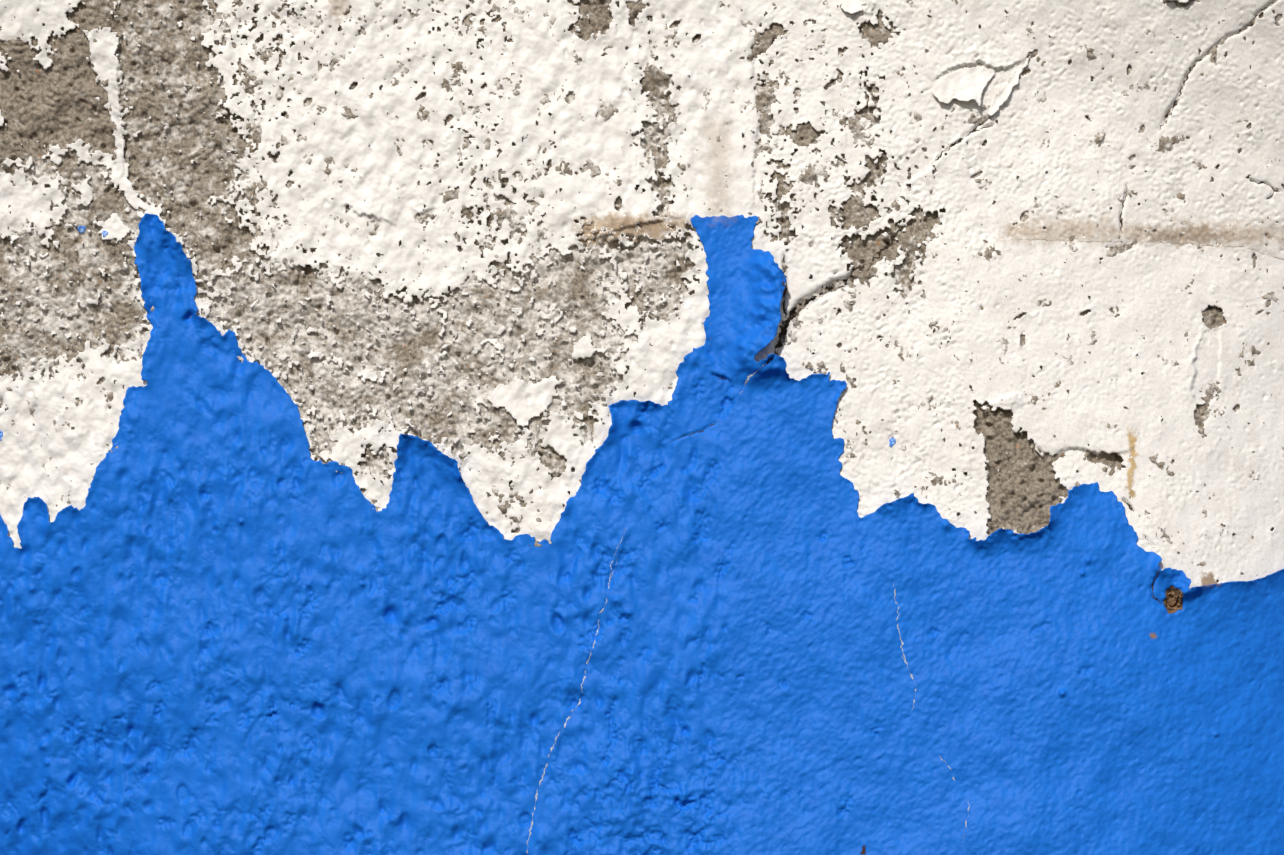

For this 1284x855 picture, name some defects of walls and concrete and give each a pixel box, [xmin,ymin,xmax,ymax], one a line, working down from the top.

crack [1160,2,1274,130]
spalling [0,0,728,548]
crack [718,226,904,394]
peeling [720,0,1284,615]
crack [526,529,626,853]